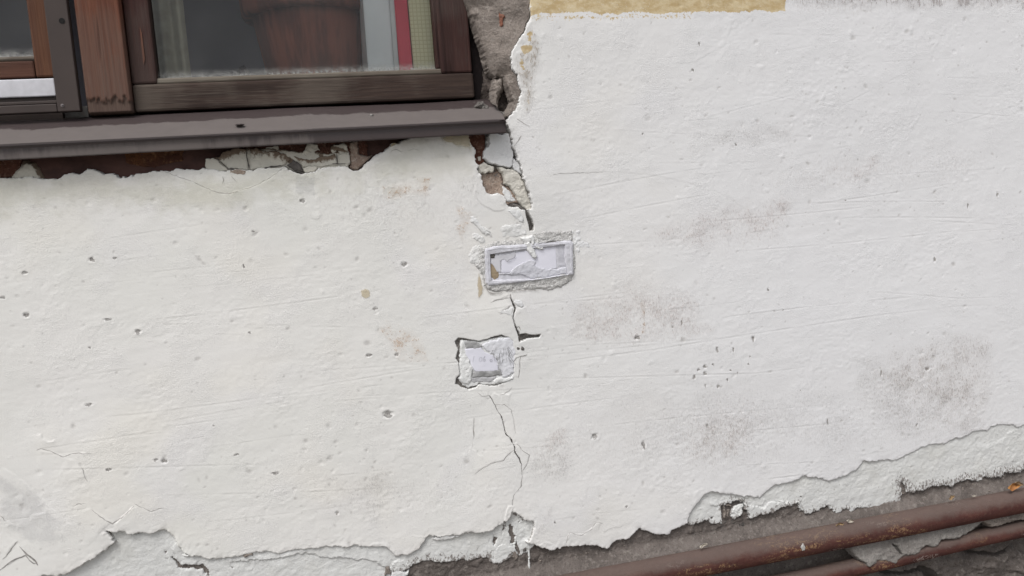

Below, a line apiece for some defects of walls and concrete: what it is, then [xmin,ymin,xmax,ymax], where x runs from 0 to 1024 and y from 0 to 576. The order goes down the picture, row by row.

spalling [0,139,406,179]
spalling [463,0,531,244]
crack [511,203,533,230]
crack [479,279,539,502]
peeling [688,424,1024,525]
peeling [42,512,534,576]